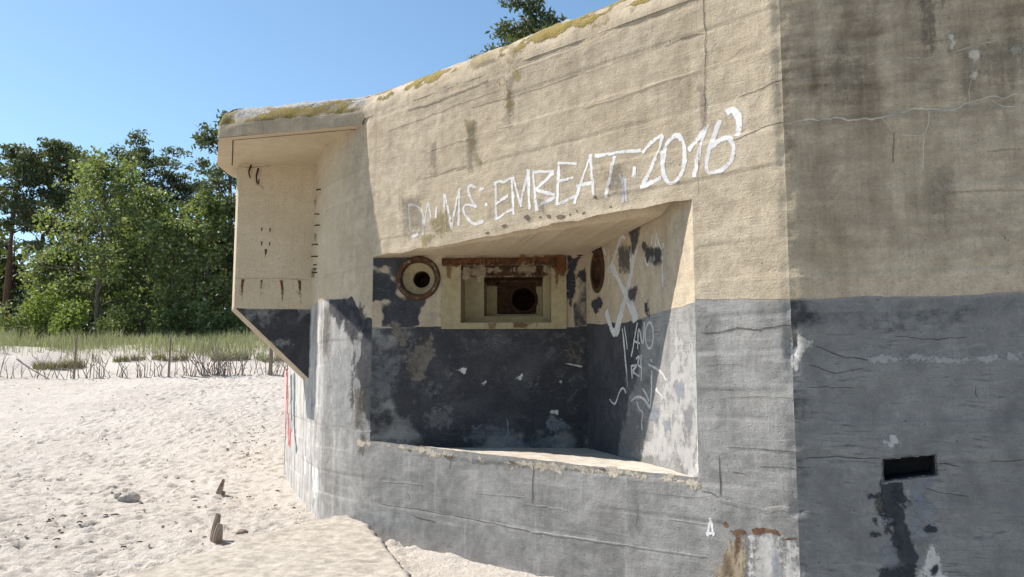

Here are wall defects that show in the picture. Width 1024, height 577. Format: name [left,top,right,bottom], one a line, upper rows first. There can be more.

crack [390,0,746,131]
crack [734,65,1024,172]
corrosion [443,254,566,287]
peeling [566,247,602,307]
peeling [618,227,663,273]
peeling [591,297,603,314]
peeling [628,286,650,317]
spalling [787,330,814,371]
peeling [331,343,457,459]
spalling [504,460,647,480]
peeling [868,479,919,577]
corrosion [714,534,747,577]